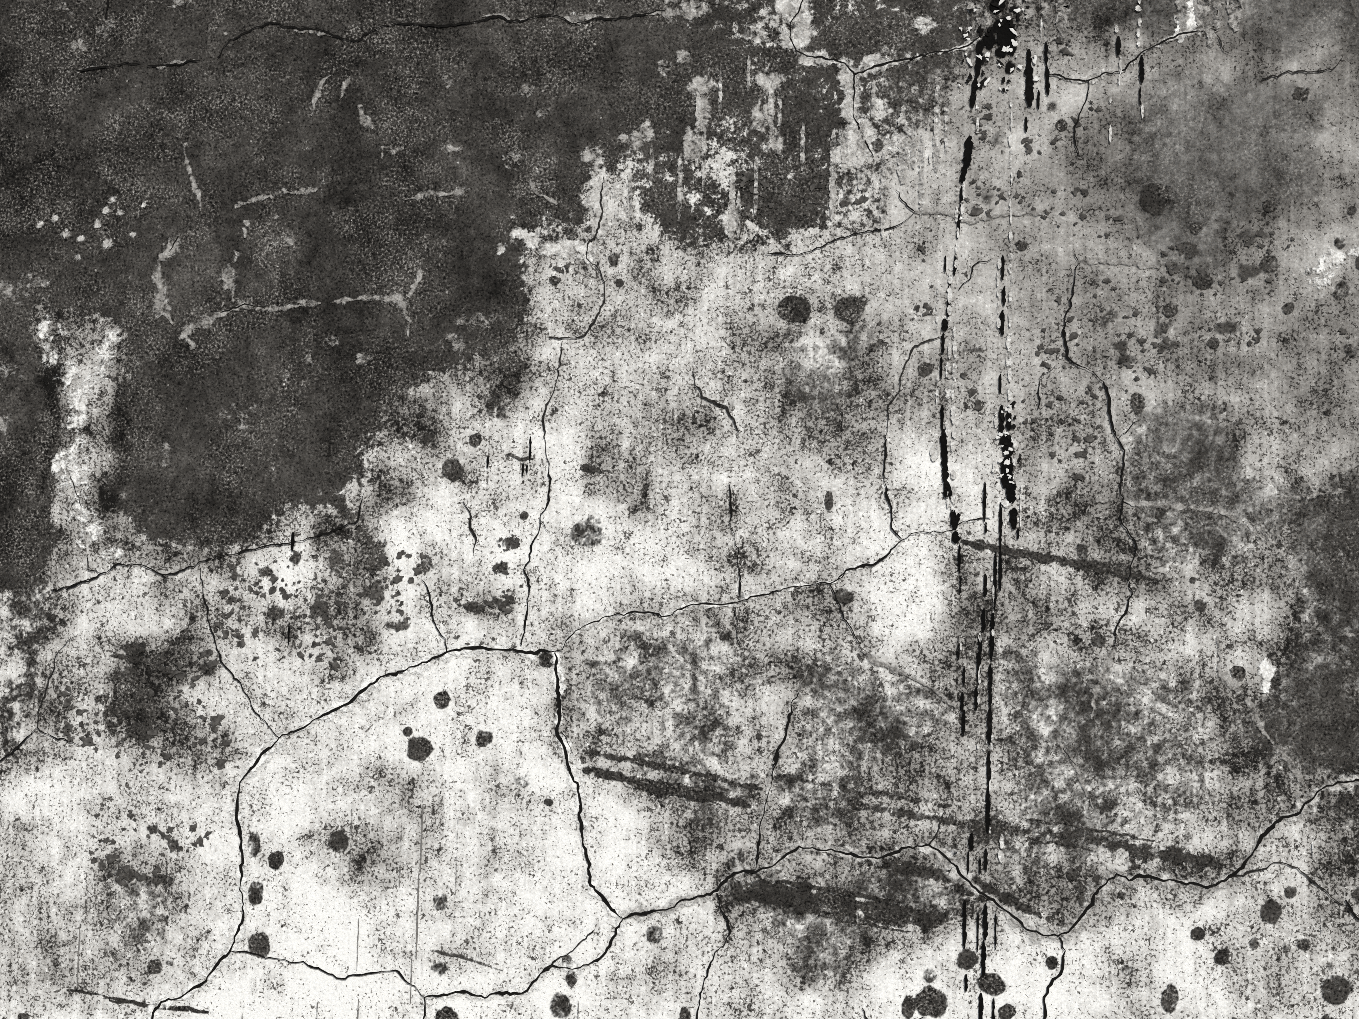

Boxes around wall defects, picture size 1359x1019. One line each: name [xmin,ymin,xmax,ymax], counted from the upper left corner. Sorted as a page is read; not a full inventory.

peeling [497,147,632,281]
peeling [619,119,654,150]
peeling [683,75,713,165]
peeling [721,0,944,234]
peeling [965,170,1089,227]
peeling [1021,133,1059,155]
crack [1262,58,1342,80]
damp [0,0,1359,761]
crack [51,177,1359,1019]
damp [727,99,1223,1019]
crack [0,634,78,762]
damp [588,632,755,828]